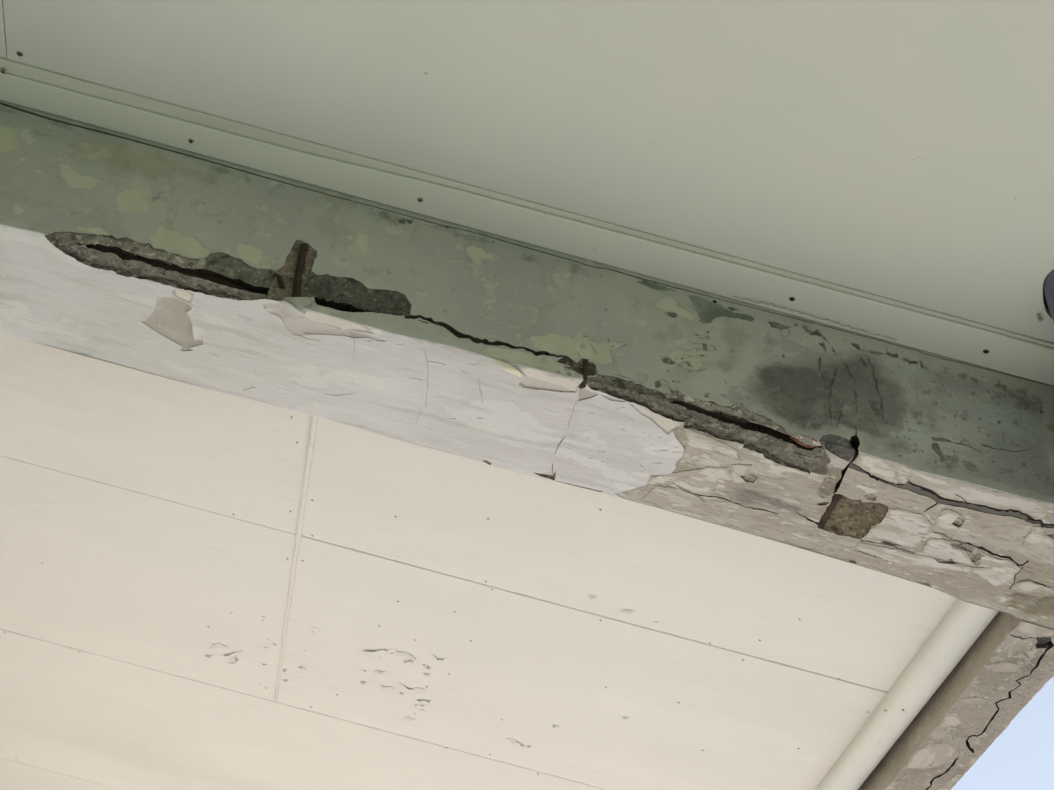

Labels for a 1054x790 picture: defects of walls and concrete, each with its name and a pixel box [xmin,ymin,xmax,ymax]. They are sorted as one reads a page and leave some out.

spalling [44,232,412,351]
crack [396,315,566,424]
water stain [636,278,932,457]
crack [672,482,818,525]
peeling [484,296,1054,649]
crack [833,430,1054,590]
peeling [905,697,986,769]
peeling [938,774,963,790]
crack [925,641,1054,790]